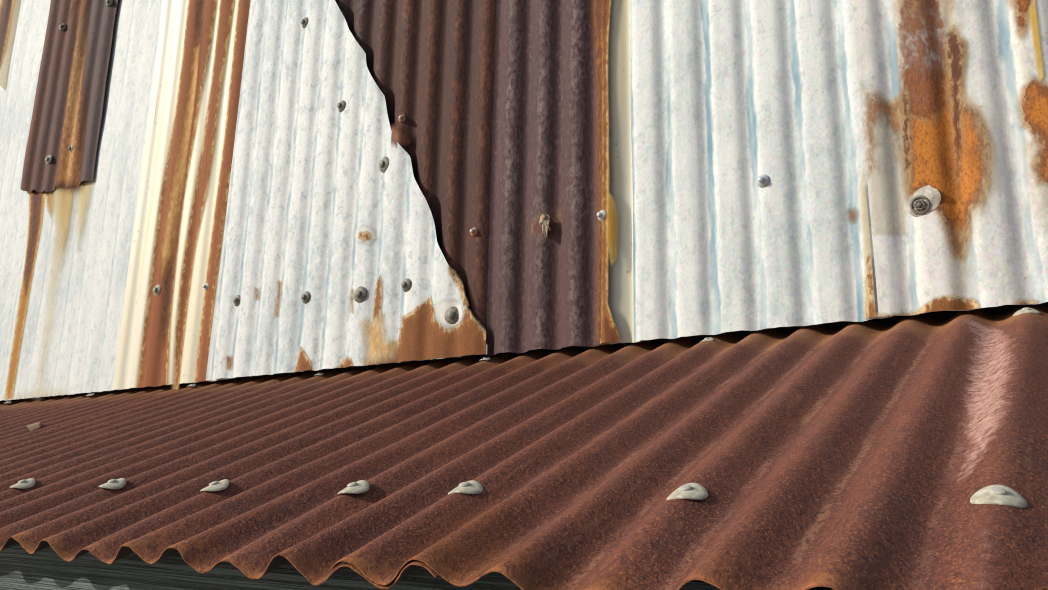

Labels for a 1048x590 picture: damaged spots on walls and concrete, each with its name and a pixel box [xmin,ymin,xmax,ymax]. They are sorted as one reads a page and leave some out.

rust [0,0,20,89]
rust [5,41,92,399]
rust [137,0,251,390]
rust [274,281,282,317]
rust [294,347,312,372]
rust [355,225,376,244]
rust [336,266,486,368]
rust [593,0,620,344]
rust [860,175,979,319]
rust [898,0,991,259]
rust [1011,0,1048,185]